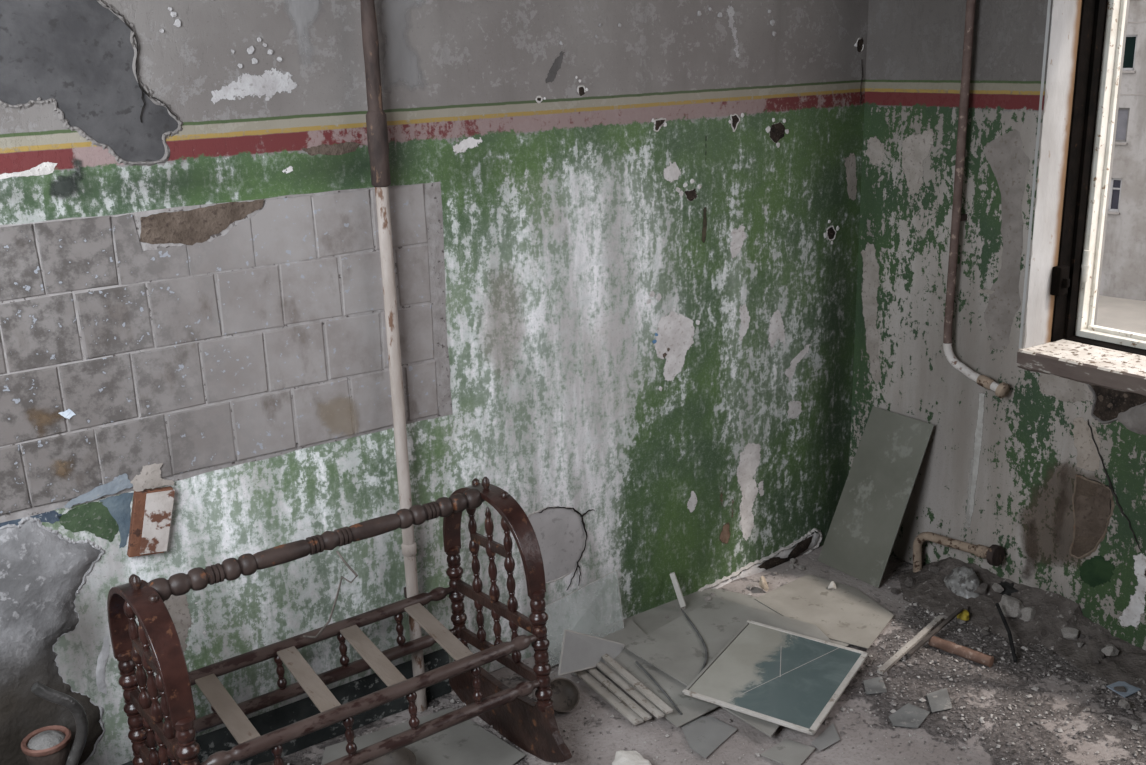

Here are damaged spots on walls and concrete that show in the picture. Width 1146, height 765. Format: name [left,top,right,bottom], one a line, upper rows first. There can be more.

flaking render [0,0,183,166]
peeling [211,37,297,104]
peeling [0,162,57,179]
flaking render [140,199,264,245]
peeling [652,311,700,391]
peeling [861,242,882,384]
flaking render [1038,373,1146,471]
peeling [0,462,175,549]
crack [1078,421,1142,552]
crack [539,506,595,590]
flaking render [698,528,822,591]
flaking render [1119,553,1146,627]